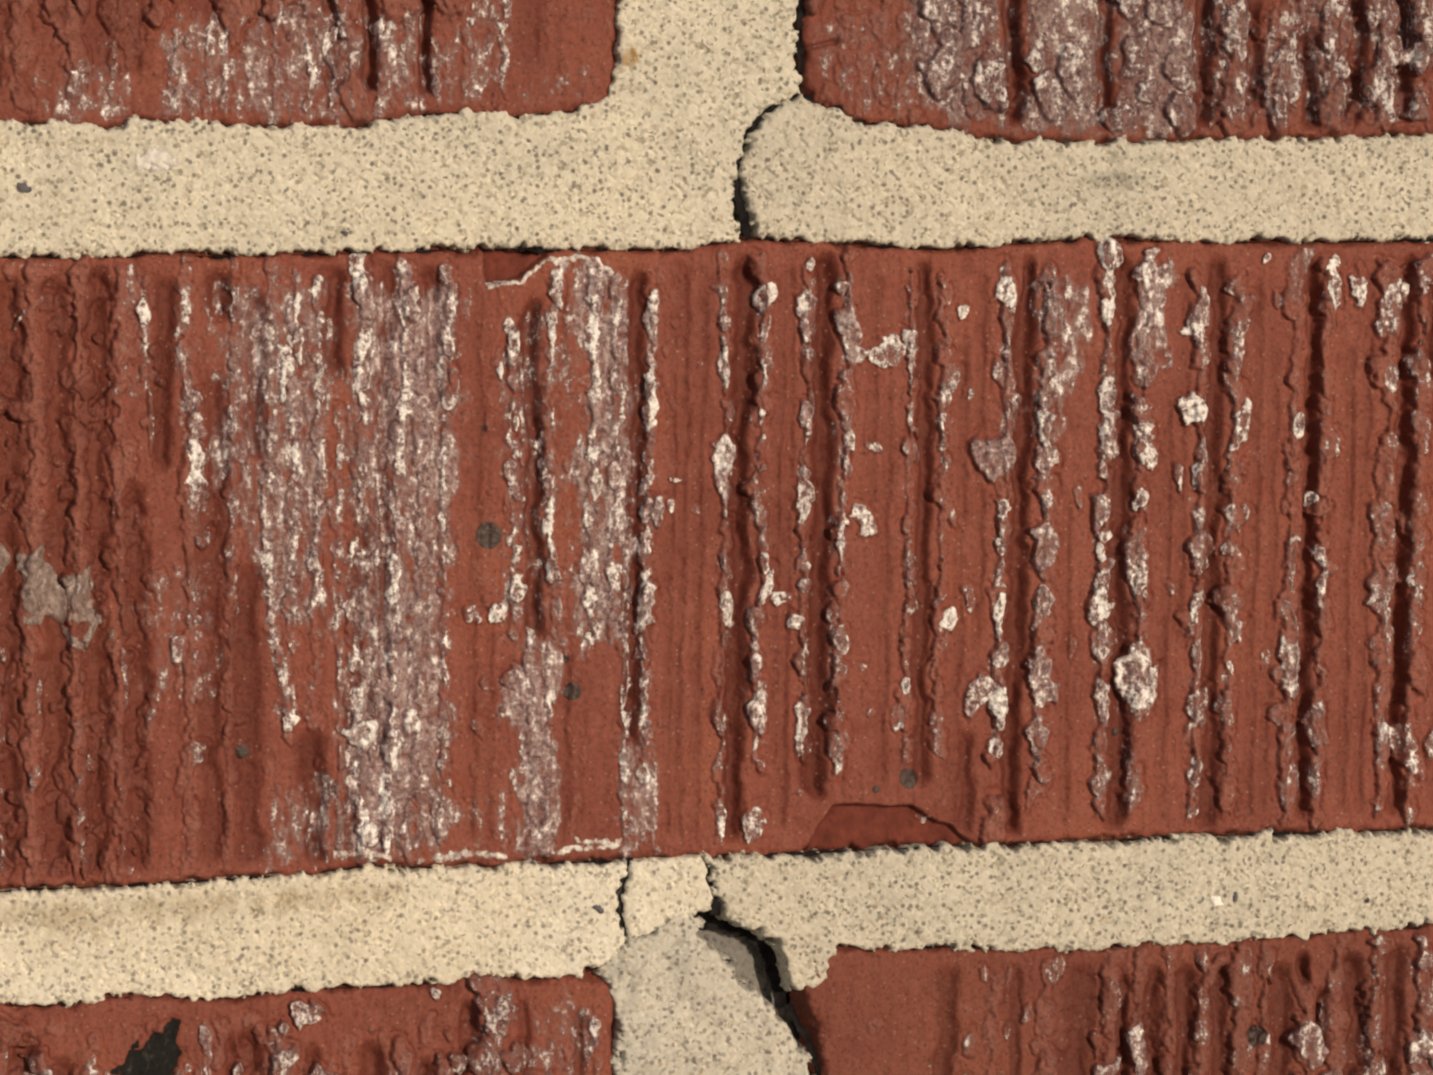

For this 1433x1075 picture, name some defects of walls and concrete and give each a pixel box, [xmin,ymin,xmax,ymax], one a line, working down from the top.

damp [160,0,513,127]
crack [197,0,1079,260]
damp [890,0,1433,142]
crack [3,252,60,260]
damp [834,275,916,423]
crack [1200,237,1433,245]
damp [1322,254,1433,337]
damp [176,251,681,864]
damp [719,464,846,775]
damp [965,236,1255,809]
crack [1212,828,1433,836]
crack [693,835,1171,1075]